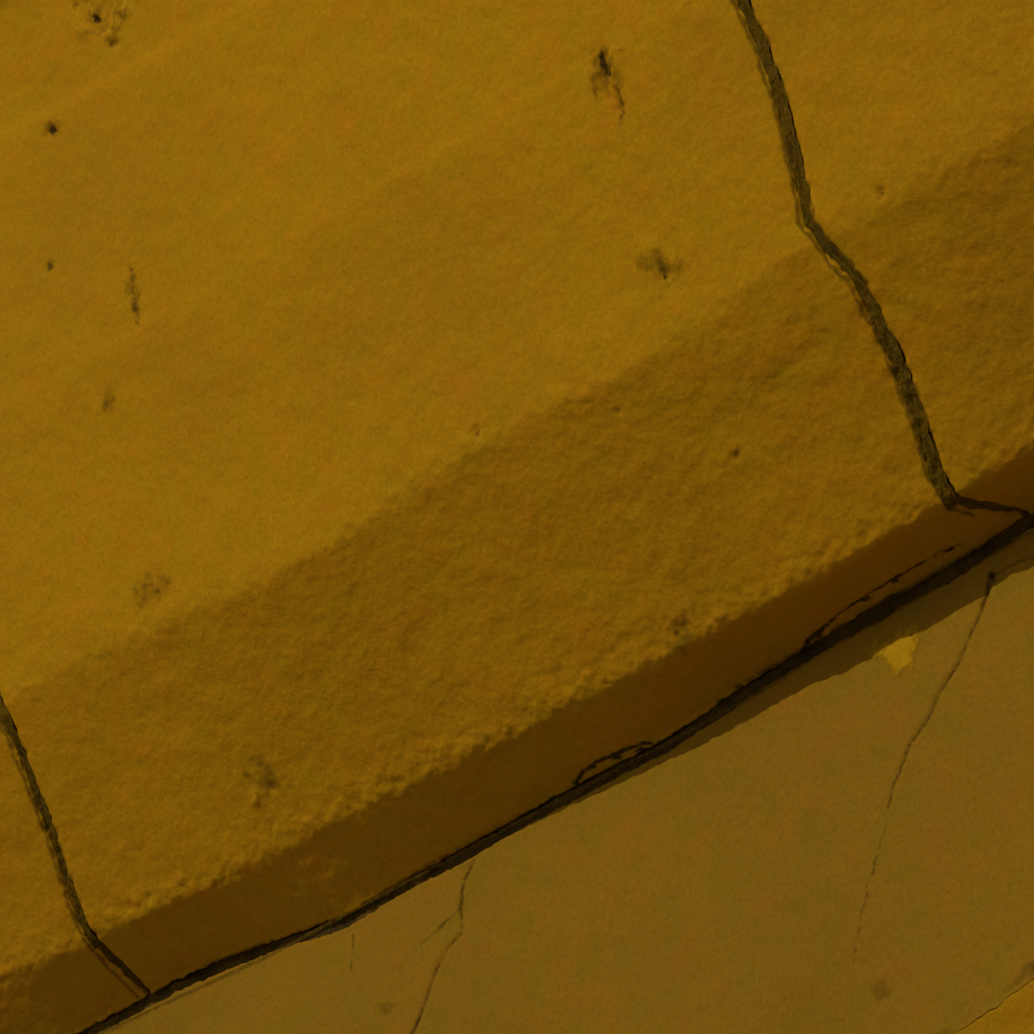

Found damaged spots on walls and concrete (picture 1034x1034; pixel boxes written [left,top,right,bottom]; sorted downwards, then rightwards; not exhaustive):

crack [732,0,1018,516]
crack [0,512,1034,1034]